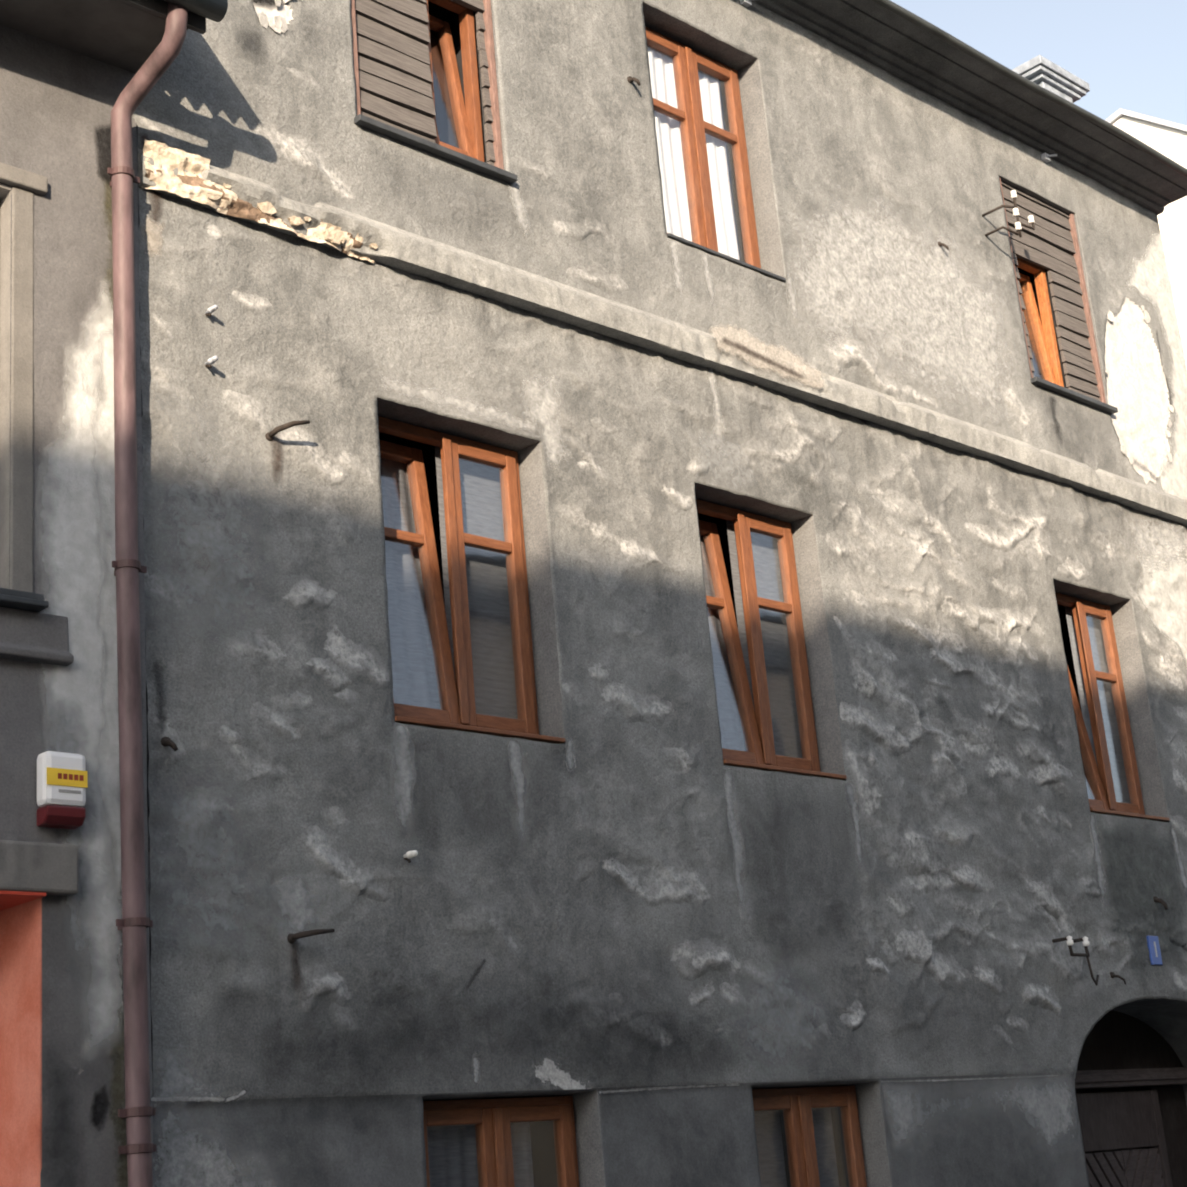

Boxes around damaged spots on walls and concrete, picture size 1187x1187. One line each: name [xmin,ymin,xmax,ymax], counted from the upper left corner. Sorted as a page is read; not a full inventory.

spalling [253,0,303,34]
spalling [142,136,378,263]
spalling [1105,297,1174,484]
leakage [42,294,128,1187]